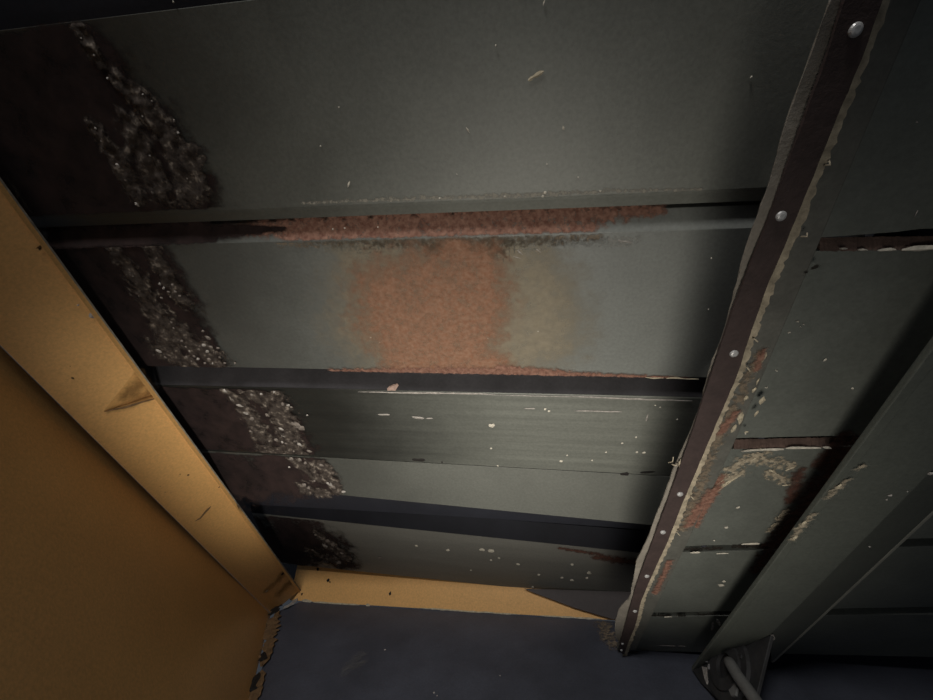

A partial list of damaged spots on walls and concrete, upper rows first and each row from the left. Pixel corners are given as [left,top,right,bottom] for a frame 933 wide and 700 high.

corrosion [46,204,687,379]
peeling [714,448,799,491]
peeling [790,513,817,541]